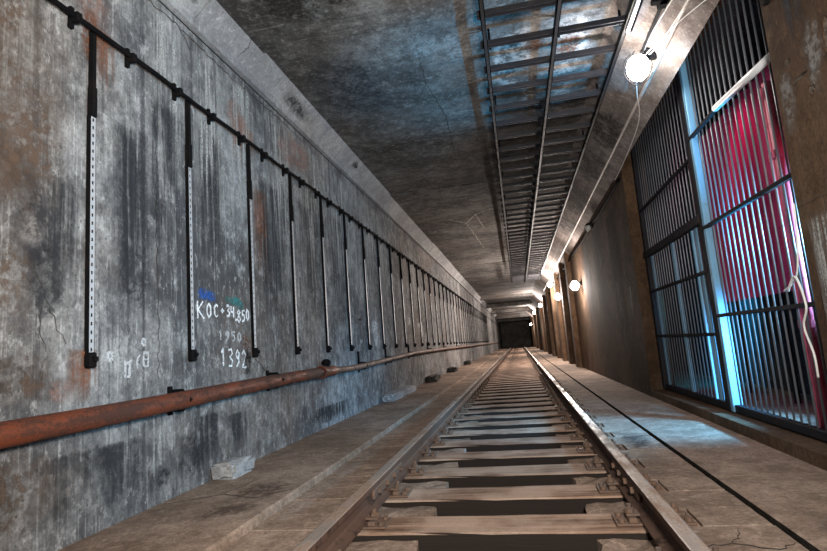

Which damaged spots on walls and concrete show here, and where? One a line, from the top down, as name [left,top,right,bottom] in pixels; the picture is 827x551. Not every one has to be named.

leakage [156,14,179,89]
peeling [782,15,827,97]
leakage [232,84,249,178]
leakage [118,100,180,301]
crack [28,254,66,352]